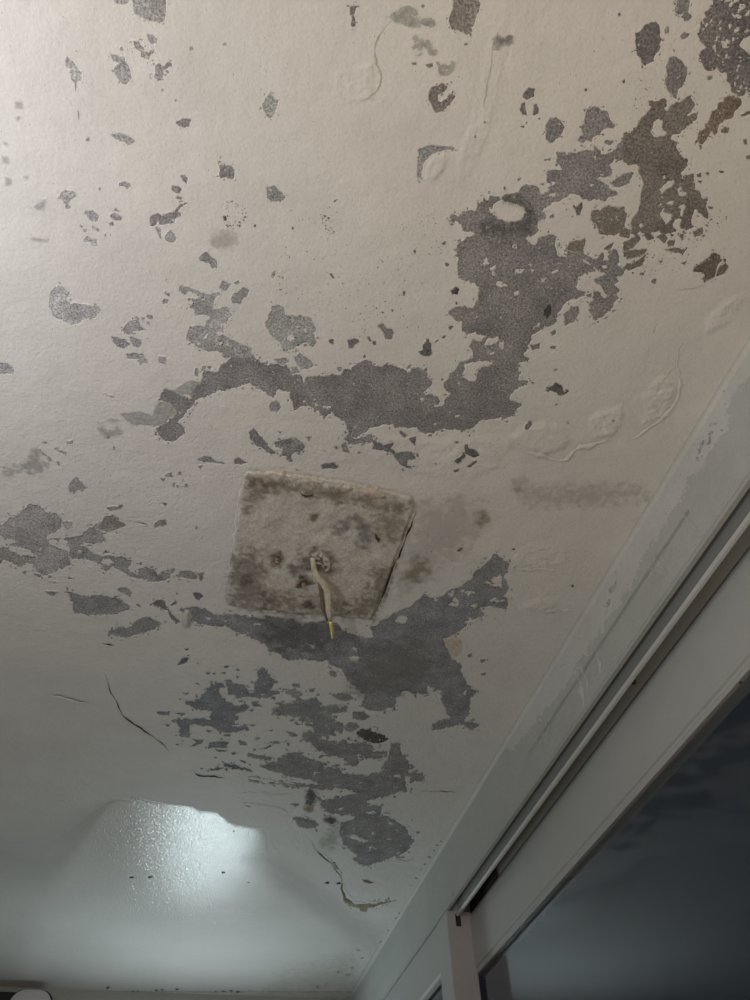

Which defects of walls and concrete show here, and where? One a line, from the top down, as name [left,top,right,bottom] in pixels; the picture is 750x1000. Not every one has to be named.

peeling [148,0,750,473]
peeling [48,281,103,327]
crack [52,643,170,753]
peeling [0,502,516,871]
crack [312,843,398,913]